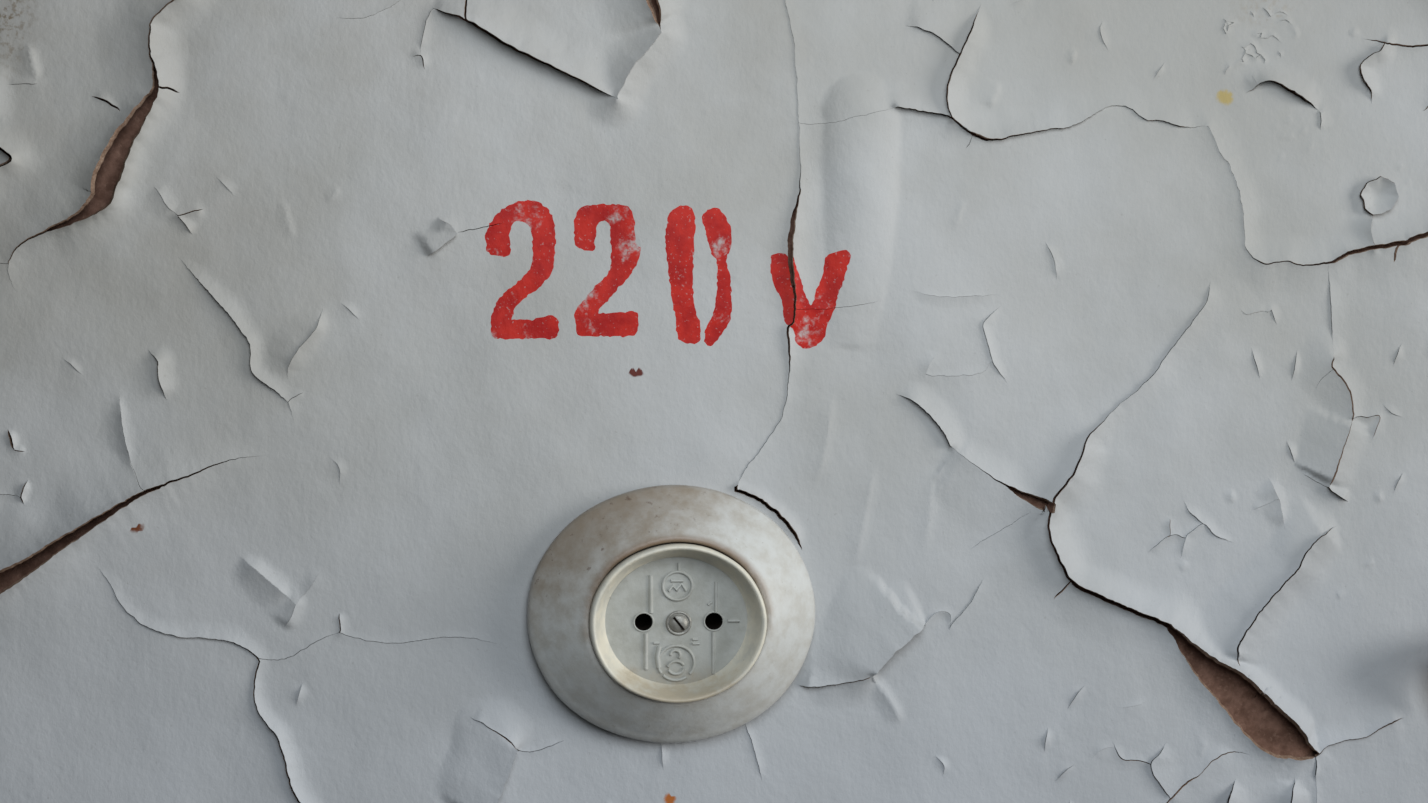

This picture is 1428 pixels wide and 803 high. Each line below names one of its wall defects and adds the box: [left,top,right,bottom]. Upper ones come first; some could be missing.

crack [0,0,207,308]
crack [0,384,506,803]
crack [731,0,1428,803]